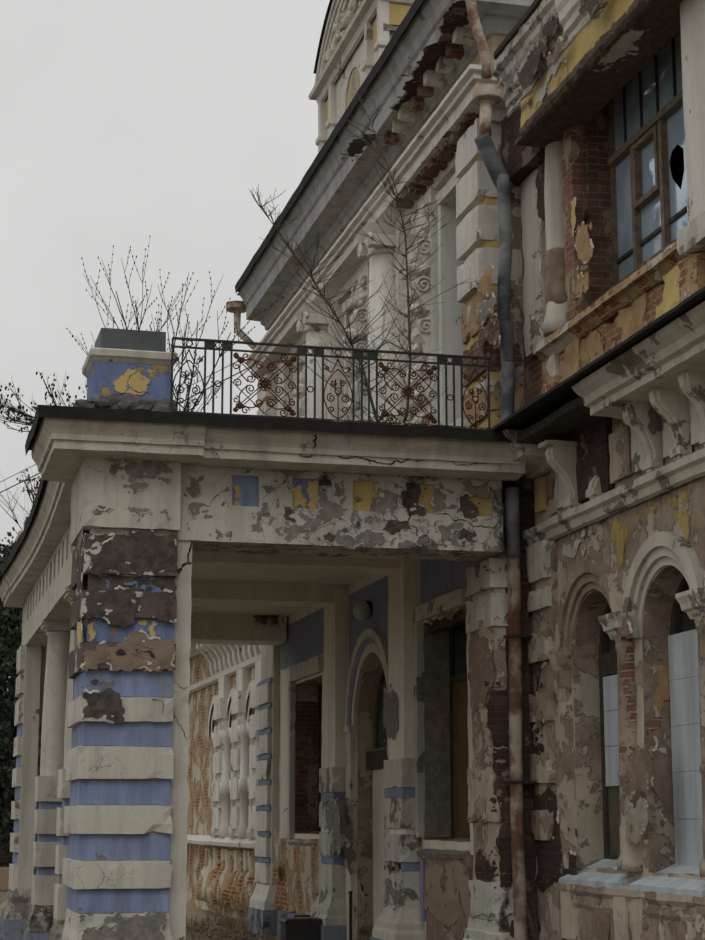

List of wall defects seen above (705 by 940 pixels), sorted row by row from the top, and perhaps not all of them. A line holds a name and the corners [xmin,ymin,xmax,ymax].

flaking render [389,0,469,114]
spalling [517,13,567,108]
spalling [571,197,594,298]
flaking render [473,266,501,362]
peeling [112,369,154,396]
crack [300,435,423,465]
crack [177,541,192,576]
peeling [250,471,491,550]
spalling [76,507,178,724]
spalling [468,628,513,891]
spalling [623,663,675,846]
flaking render [533,787,577,892]